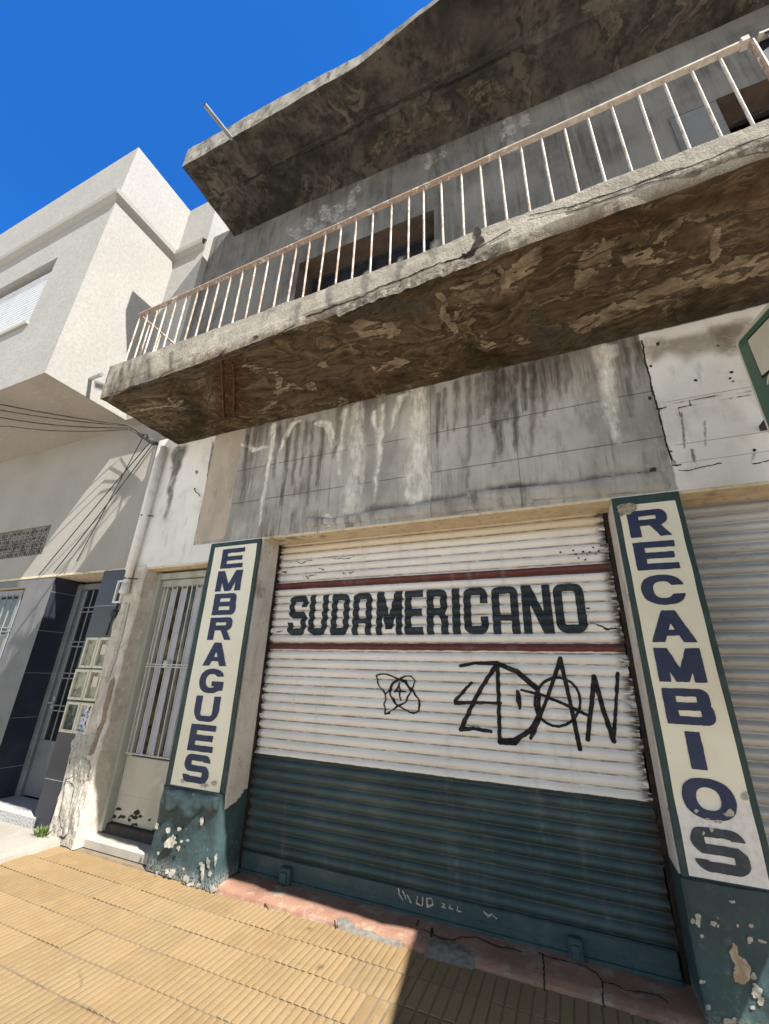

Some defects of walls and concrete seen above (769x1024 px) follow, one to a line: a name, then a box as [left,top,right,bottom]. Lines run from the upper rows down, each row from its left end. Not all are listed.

crack [109,135,769,395]
leakage [592,344,620,443]
crack [641,340,722,471]
leakage [165,446,186,516]
leakage [241,387,432,526]
peeling [113,807,189,855]
peeling [156,854,217,893]
crack [416,919,669,1008]
peeling [691,914,719,938]
spalling [729,924,767,1010]